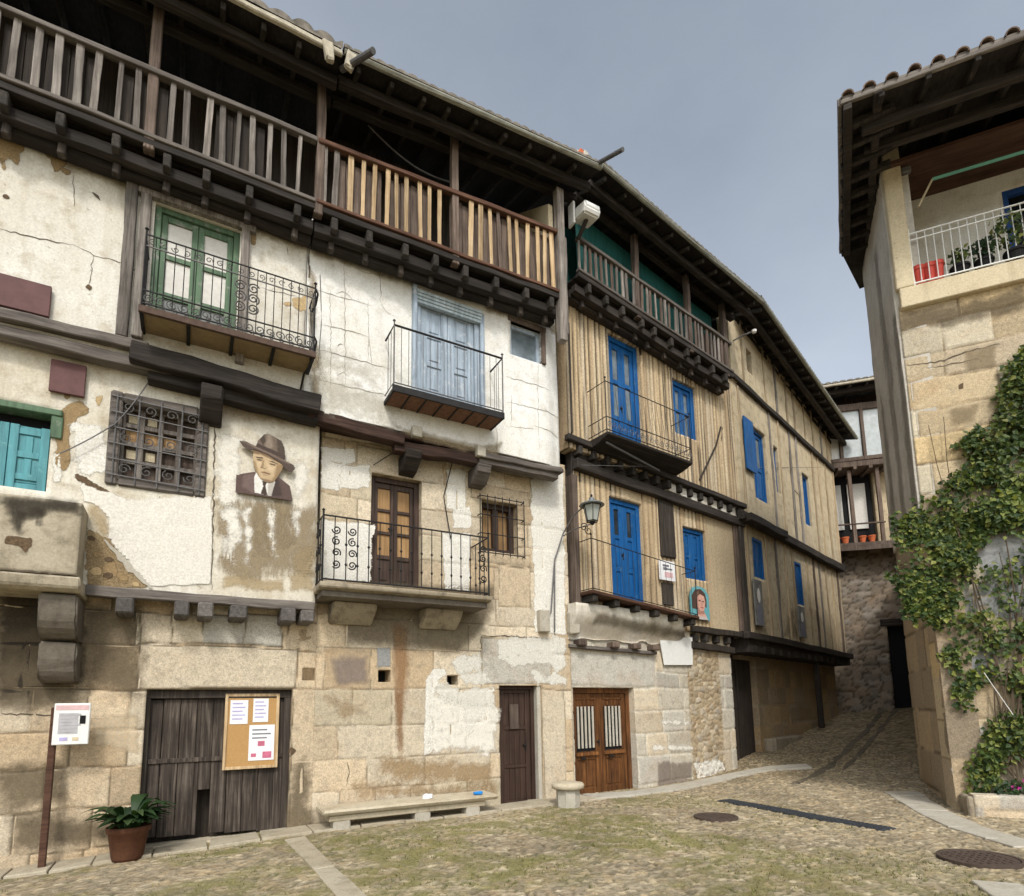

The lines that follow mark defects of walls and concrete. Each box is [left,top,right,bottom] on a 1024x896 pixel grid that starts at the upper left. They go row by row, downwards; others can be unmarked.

flaking render [0,138,24,170]
crack [3,229,136,291]
flaking render [55,395,109,492]
water stain [2,497,78,531]
spalling [5,536,32,552]
spalling [85,506,152,589]
water stain [217,500,320,590]
peeling [552,633,566,656]
peeling [530,669,567,686]